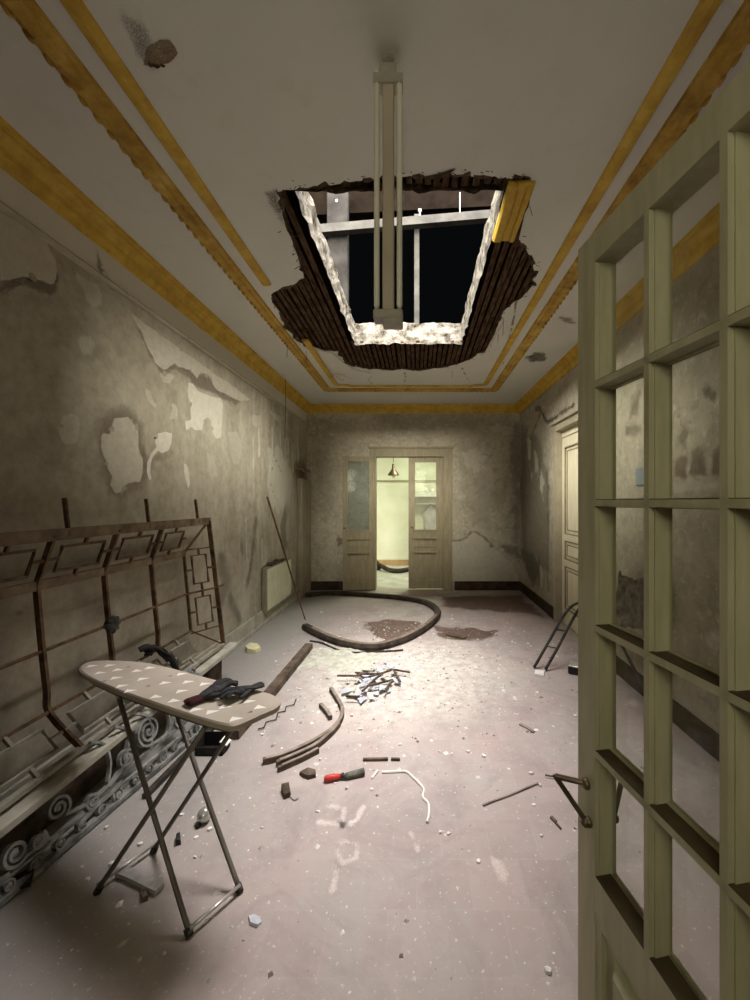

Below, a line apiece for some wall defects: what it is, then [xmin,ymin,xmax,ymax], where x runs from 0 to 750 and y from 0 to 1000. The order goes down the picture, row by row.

flaking render [121,15,177,69]
spalling [292,183,507,345]
flaking render [314,347,372,379]
flaking render [488,321,508,357]
flaking render [92,314,249,502]
crack [530,403,574,438]